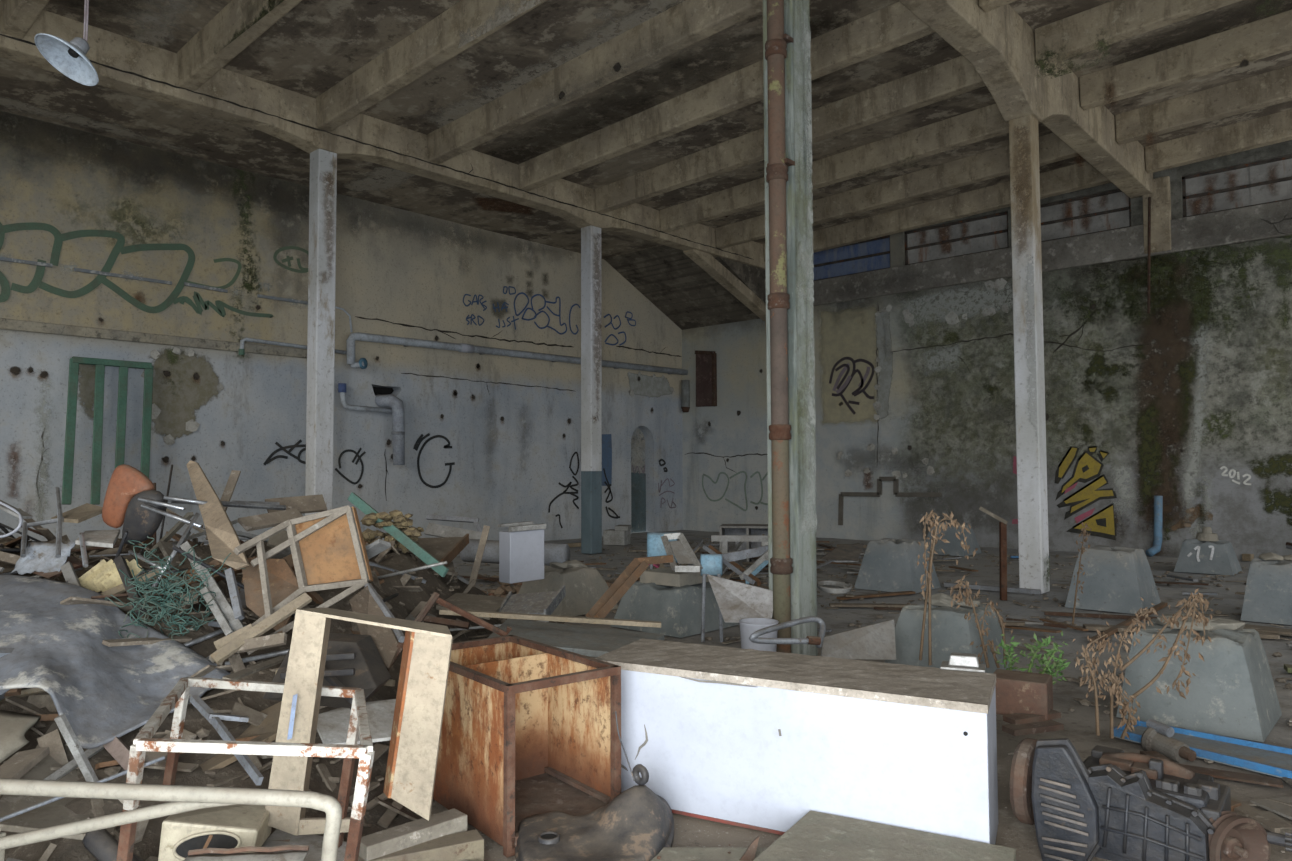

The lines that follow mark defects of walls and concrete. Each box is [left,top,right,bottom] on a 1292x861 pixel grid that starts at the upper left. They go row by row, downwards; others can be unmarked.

water stain [427,0,678,128]
water stain [490,39,750,163]
peeling [78,364,95,419]
peeling [141,347,224,464]
water stain [1114,248,1216,556]